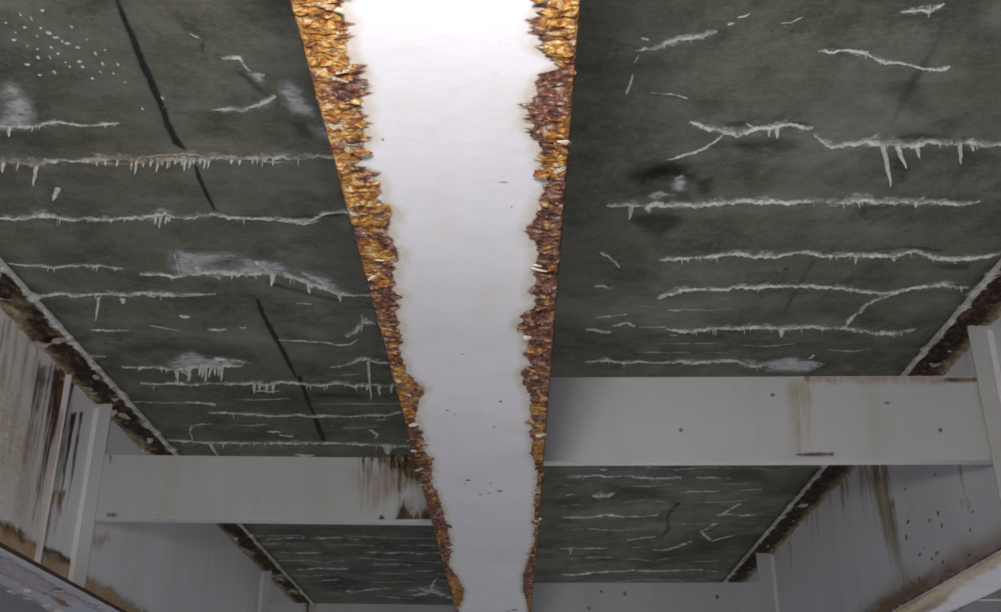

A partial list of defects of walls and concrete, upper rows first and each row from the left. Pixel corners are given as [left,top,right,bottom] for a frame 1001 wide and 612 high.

crack [0,56,348,228]
rust [0,265,178,528]
crack [7,250,412,457]
rust [290,0,464,612]
rust [516,0,581,612]
rust [857,266,1001,382]
rust [215,523,313,612]
rust [725,453,894,582]
rust [887,547,1001,612]